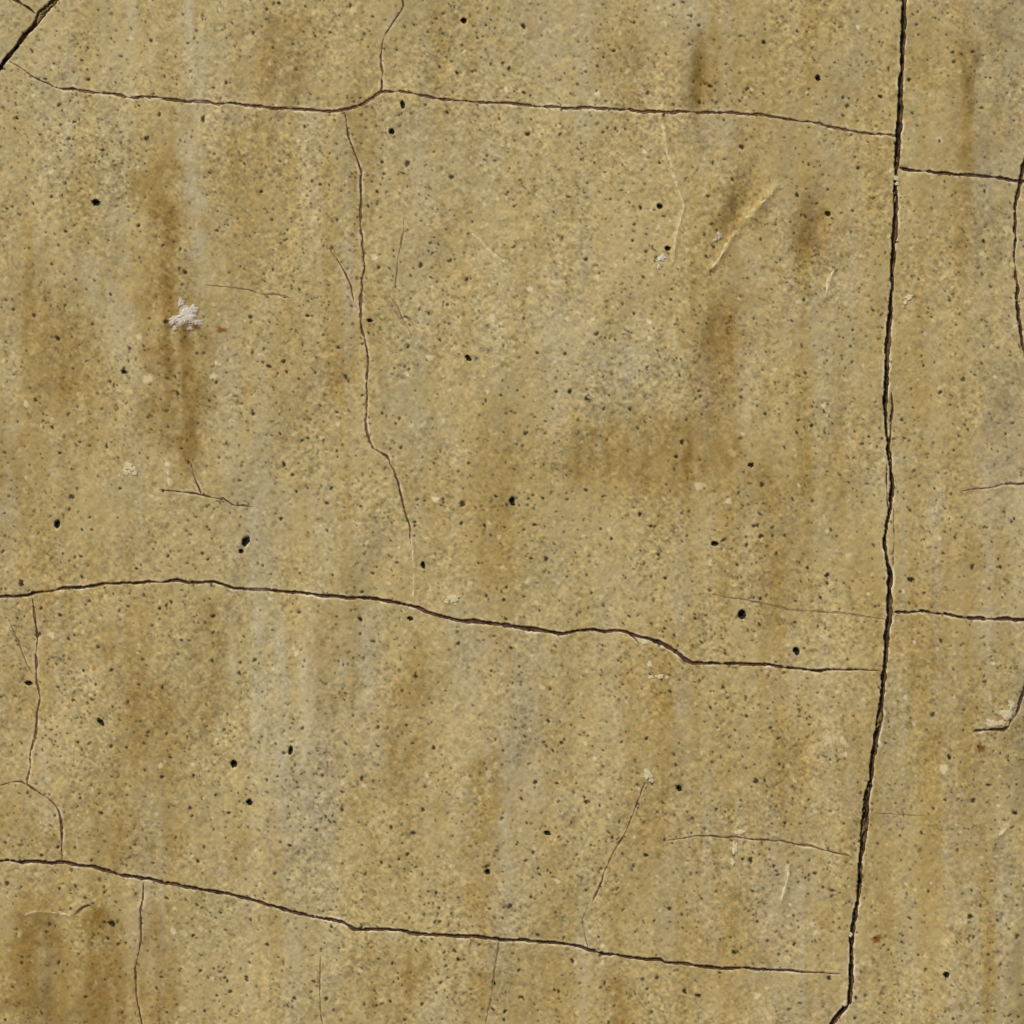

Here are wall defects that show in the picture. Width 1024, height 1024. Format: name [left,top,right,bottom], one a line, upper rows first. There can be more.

crack [0,0,1024,544]
crack [0,579,879,672]
crack [715,180,1024,1024]
crack [0,618,63,855]
crack [592,783,645,902]
crack [669,835,850,856]
crack [0,859,840,1024]